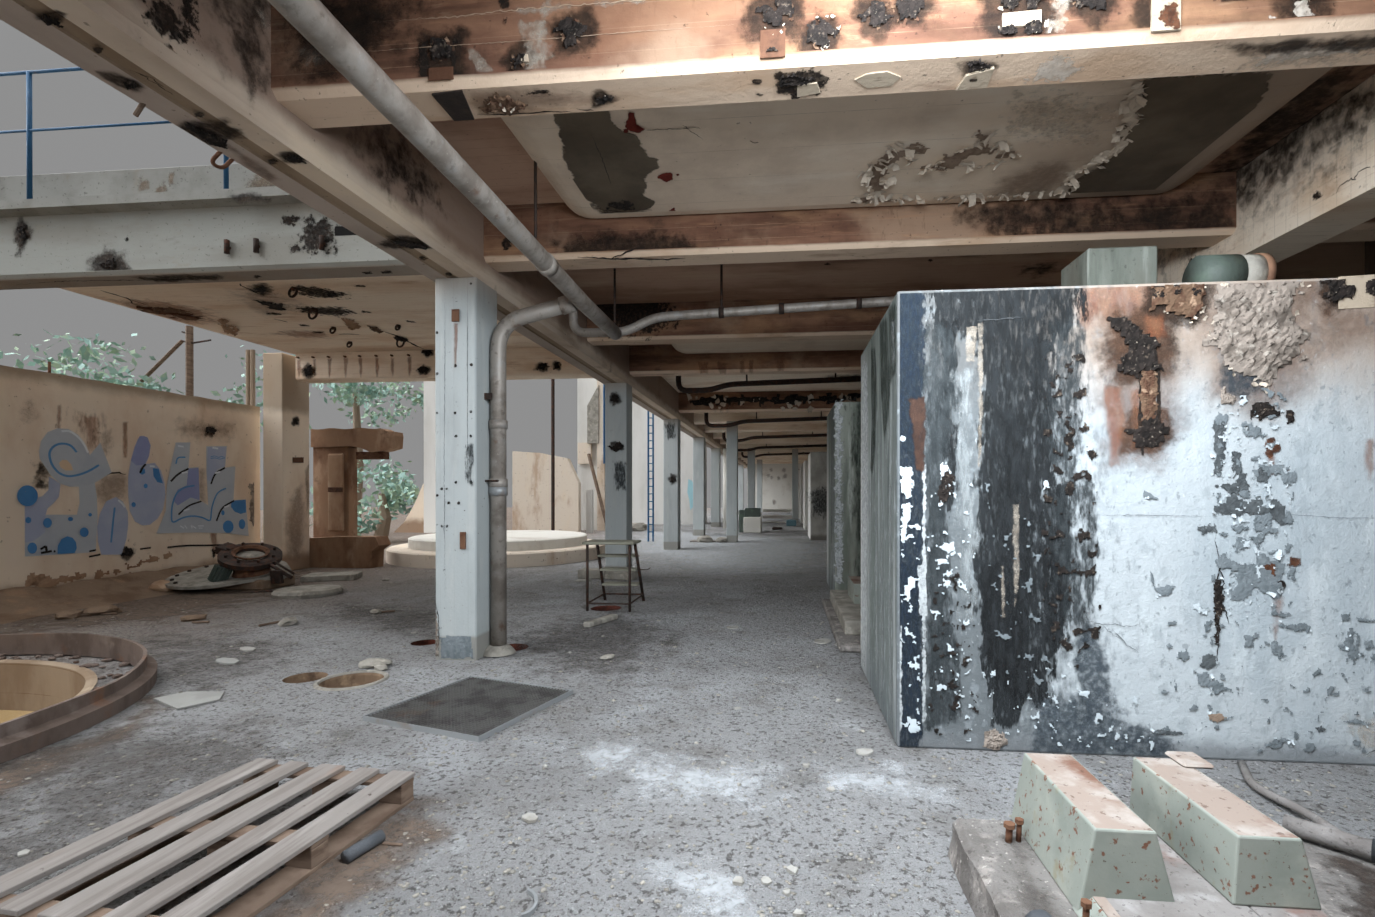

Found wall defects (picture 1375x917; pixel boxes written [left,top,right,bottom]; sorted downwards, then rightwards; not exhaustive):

water stain [141,0,200,52]
spalling [591,199,648,214]
peeling [851,82,1148,207]
water stain [833,288,1174,756]
peeling [900,354,1199,751]
spalling [1105,274,1375,729]
peeling [1253,612,1375,758]